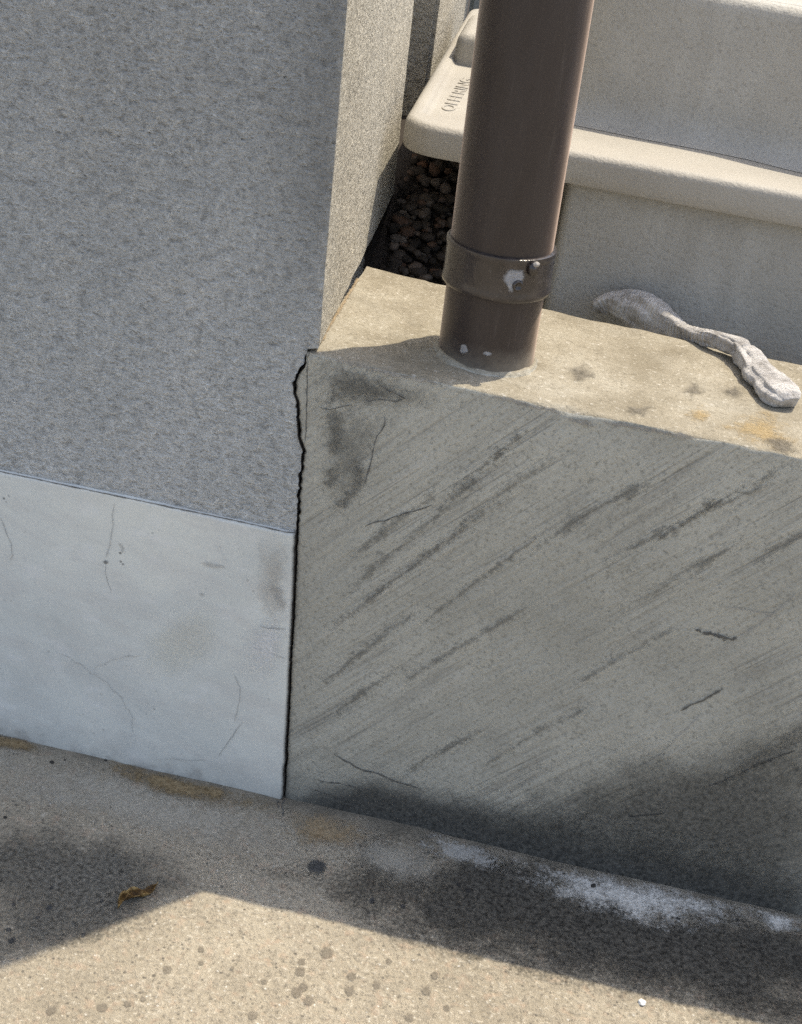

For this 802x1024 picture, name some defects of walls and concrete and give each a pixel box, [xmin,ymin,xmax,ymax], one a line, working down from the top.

crack [0,278,359,816]
leakage [292,959,313,1005]
leakage [324,744,802,1022]